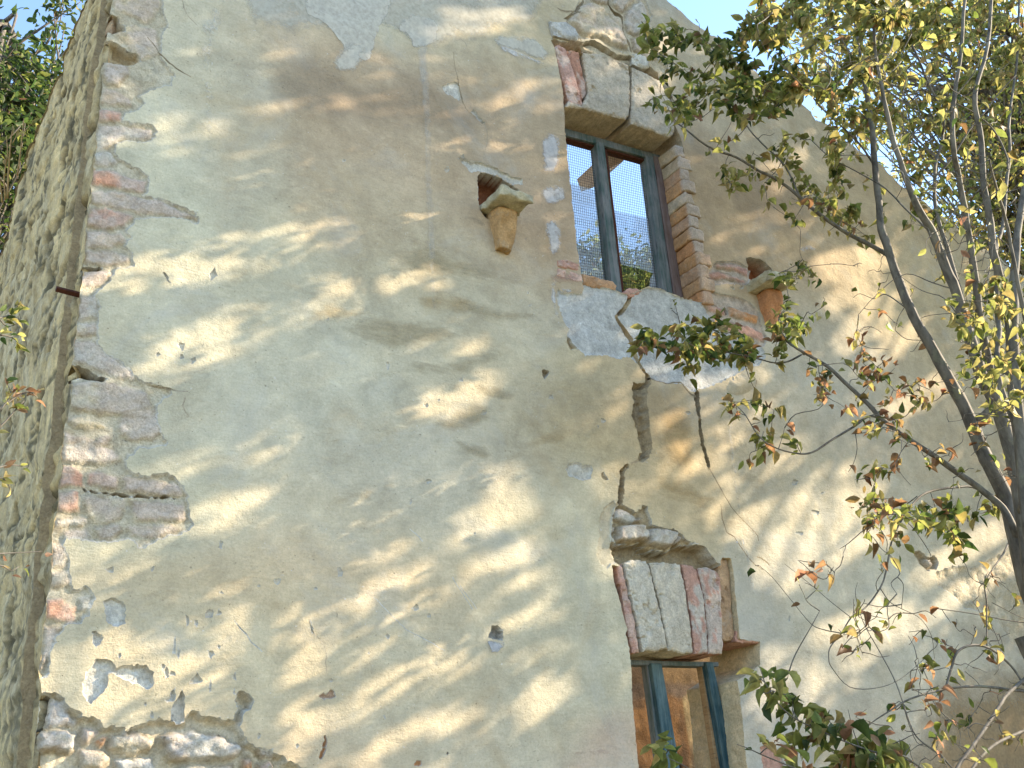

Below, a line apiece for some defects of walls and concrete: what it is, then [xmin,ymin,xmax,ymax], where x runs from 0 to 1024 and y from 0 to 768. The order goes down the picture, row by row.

peeling [336,44,363,69]
peeling [495,0,673,97]
peeling [701,260,767,347]
peeling [32,0,306,768]
crack [615,298,770,570]
spalling [596,500,721,570]